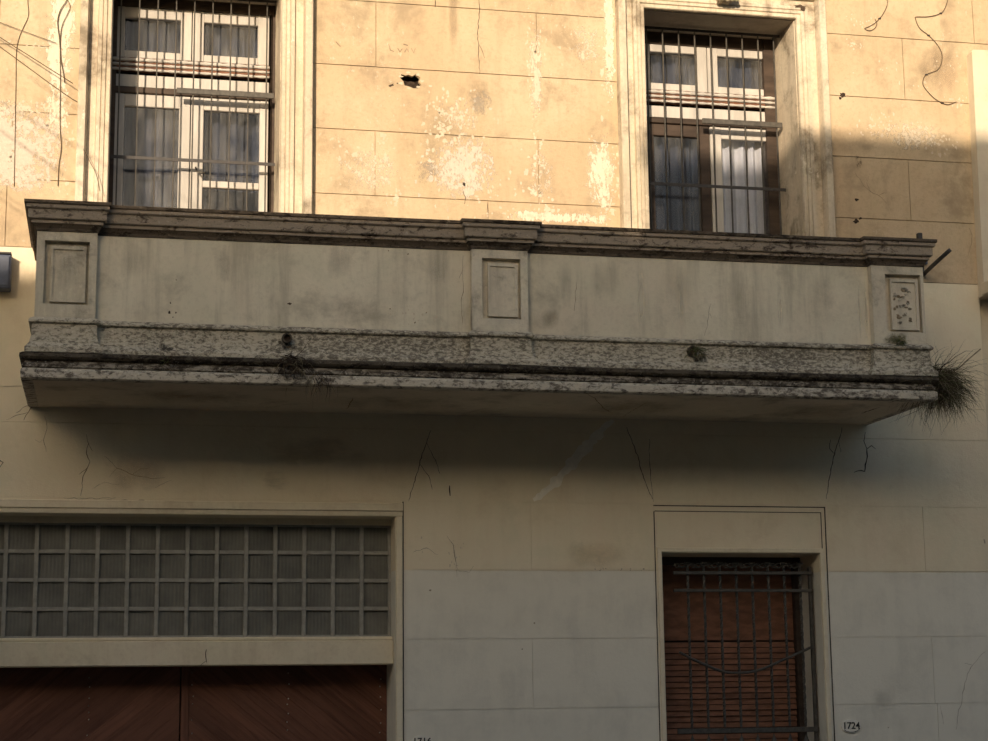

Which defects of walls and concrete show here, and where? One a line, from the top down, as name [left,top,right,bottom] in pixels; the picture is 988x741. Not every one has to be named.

peeling [0,0,76,195]
peeling [333,0,620,226]
crack [477,4,485,74]
crack [826,400,898,499]